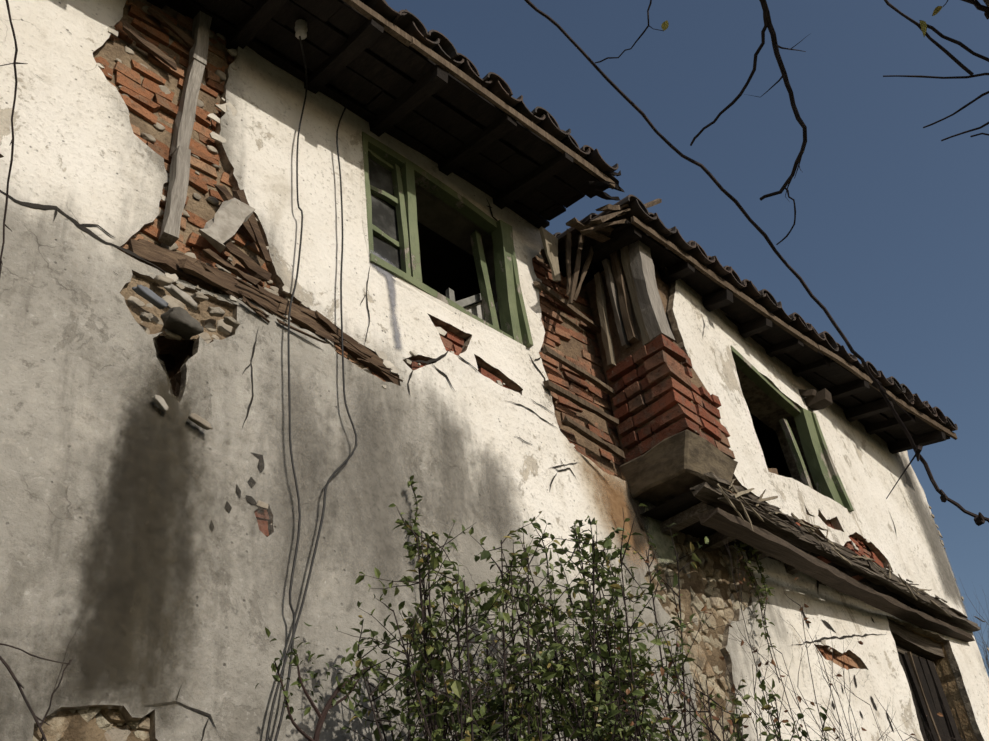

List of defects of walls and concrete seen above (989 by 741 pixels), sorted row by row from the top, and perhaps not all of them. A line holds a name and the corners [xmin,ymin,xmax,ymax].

flaking render [94,0,431,411]
spalling [433,323,468,356]
spalling [478,368,514,391]
crack [505,355,557,428]
flaking render [532,257,624,479]
crack [548,448,607,489]
spalling [236,453,277,537]
water stain [82,370,191,697]
spalling [844,535,889,568]
spalling [816,640,860,688]
spalling [32,707,151,741]